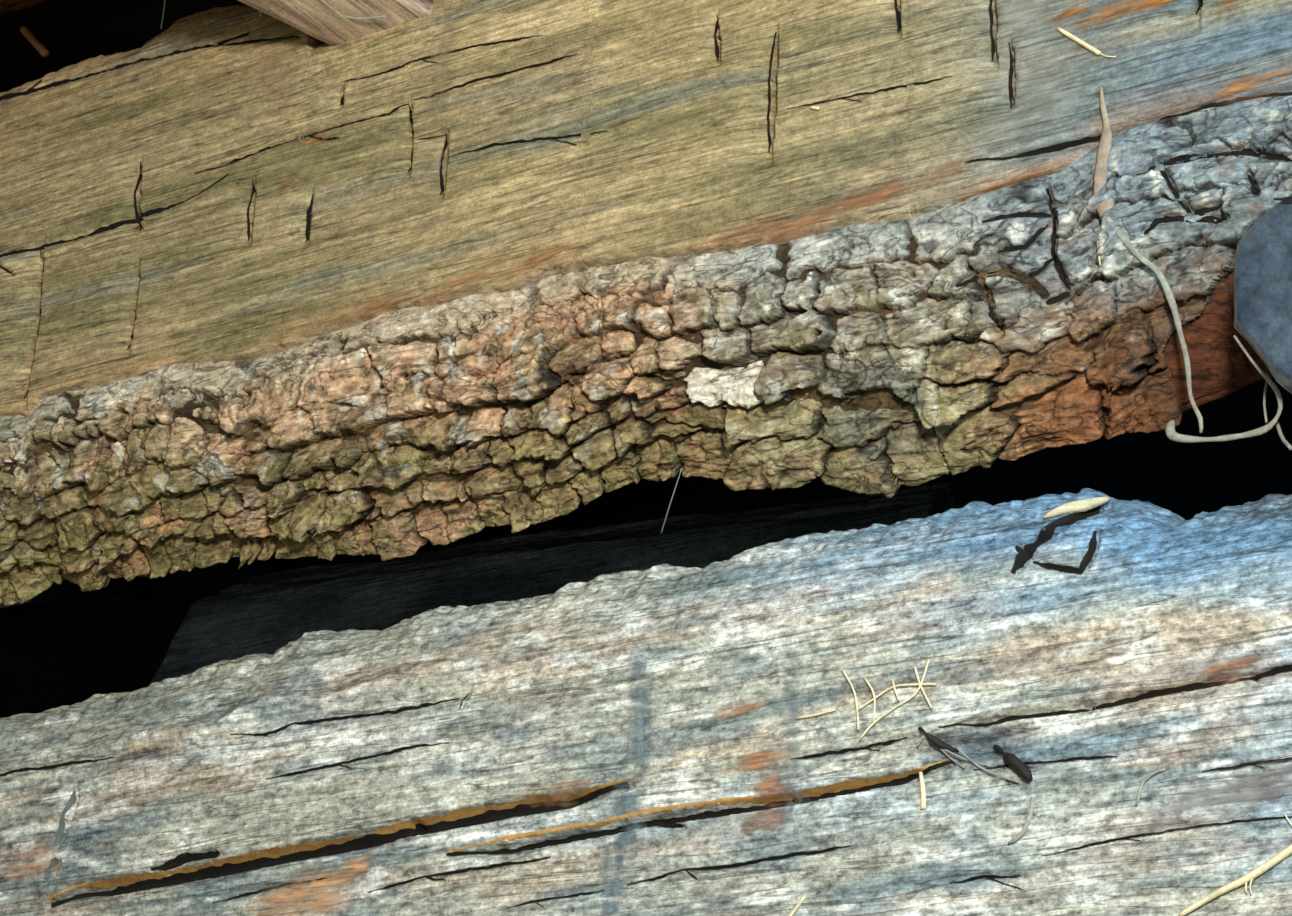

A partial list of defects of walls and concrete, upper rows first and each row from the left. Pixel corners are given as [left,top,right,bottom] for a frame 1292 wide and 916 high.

crack [0,31,576,275]
crack [417,131,606,154]
crack [46,664,1292,908]